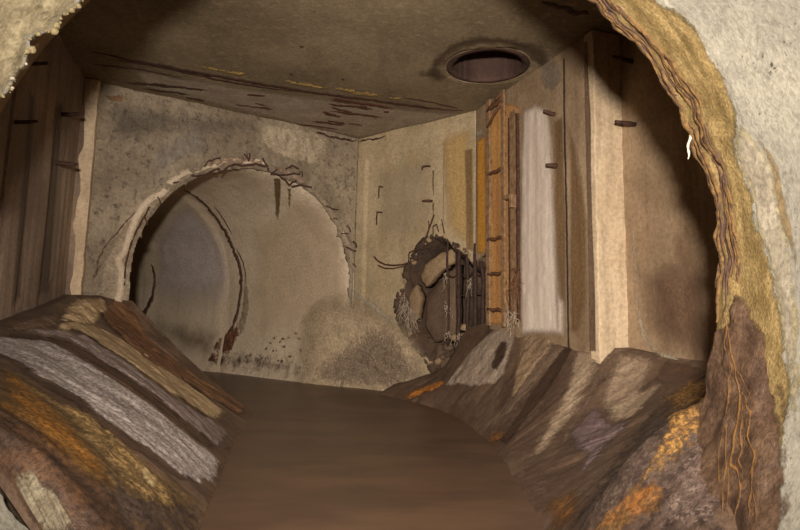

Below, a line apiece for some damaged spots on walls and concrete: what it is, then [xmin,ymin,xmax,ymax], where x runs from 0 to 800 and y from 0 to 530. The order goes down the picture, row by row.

crack [184,189,243,334]
peeling [100,98,393,291]
spalling [374,214,486,373]
rust [445,104,520,324]